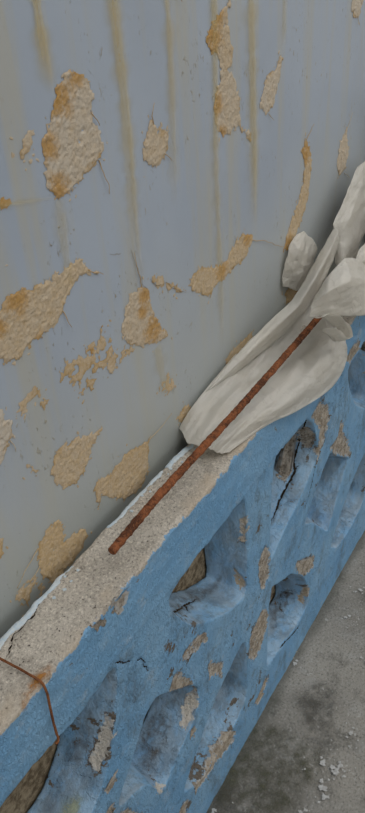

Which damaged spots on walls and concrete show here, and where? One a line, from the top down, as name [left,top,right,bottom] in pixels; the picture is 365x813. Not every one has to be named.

peeling [205,0,252,142]
peeling [10,69,110,202]
peeling [142,103,172,168]
peeling [0,258,104,366]
peeling [59,126,313,404]
peeling [0,386,49,465]
peeling [50,426,103,490]
spalling [93,316,322,555]
crack [271,420,317,521]
crack [6,604,39,658]
spalling [89,714,118,772]
spalling [104,769,143,813]